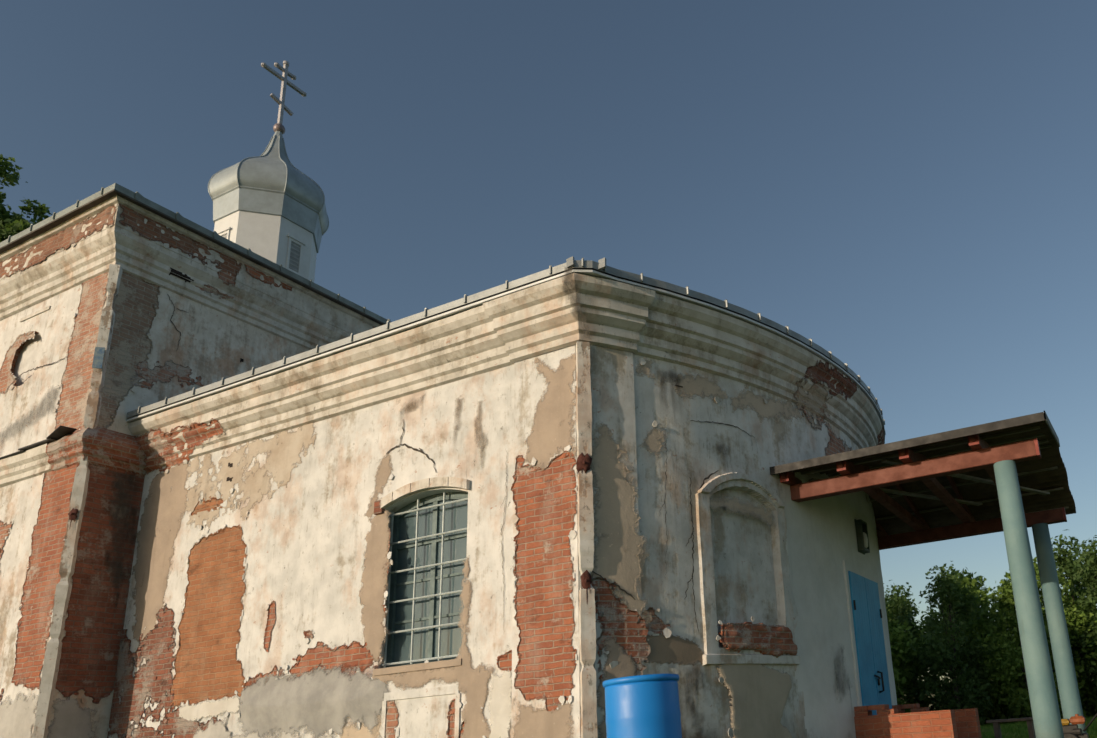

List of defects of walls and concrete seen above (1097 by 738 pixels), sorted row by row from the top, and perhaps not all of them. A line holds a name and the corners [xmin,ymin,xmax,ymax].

flaking render [0,331,35,394]
flaking render [0,423,382,738]
peeling [364,454,394,520]
crack [386,421,436,472]
flaking render [496,353,578,738]
peeling [590,420,703,684]
crack [662,430,719,631]
flaking render [799,406,852,455]